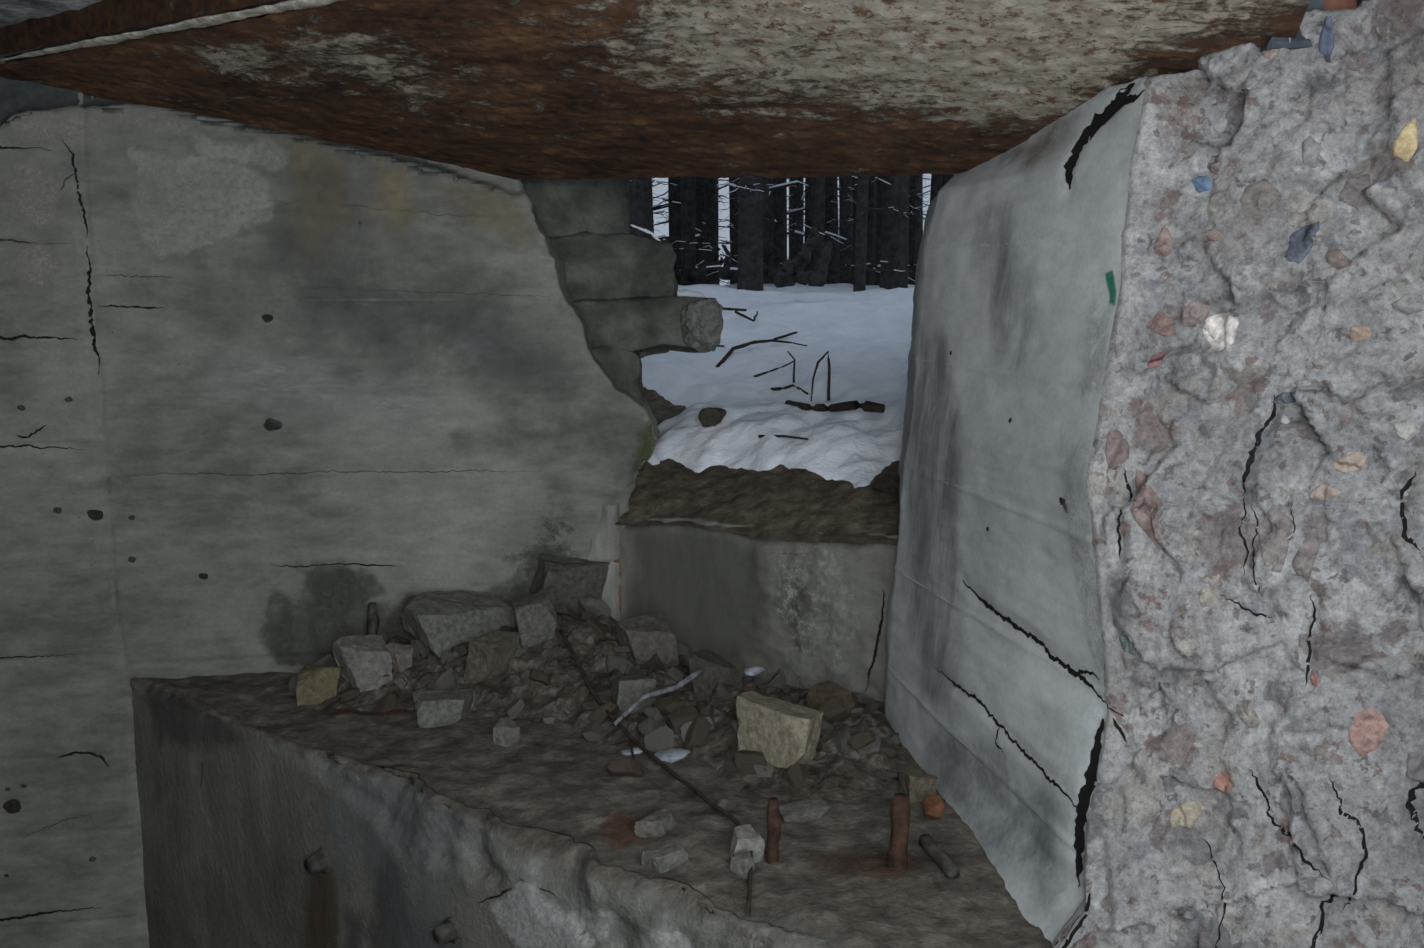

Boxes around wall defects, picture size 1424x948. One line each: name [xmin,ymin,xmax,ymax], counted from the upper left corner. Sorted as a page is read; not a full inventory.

crack [1063,83,1144,190]
crack [0,138,171,376]
crack [1226,395,1295,619]
crack [1400,471,1421,551]
damp [265,566,416,665]
crack [863,589,885,694]
crack [936,581,1127,948]
crack [1249,769,1368,948]
crack [1406,782,1424,839]
spalling [490,880,619,948]
spalling [639,903,695,948]